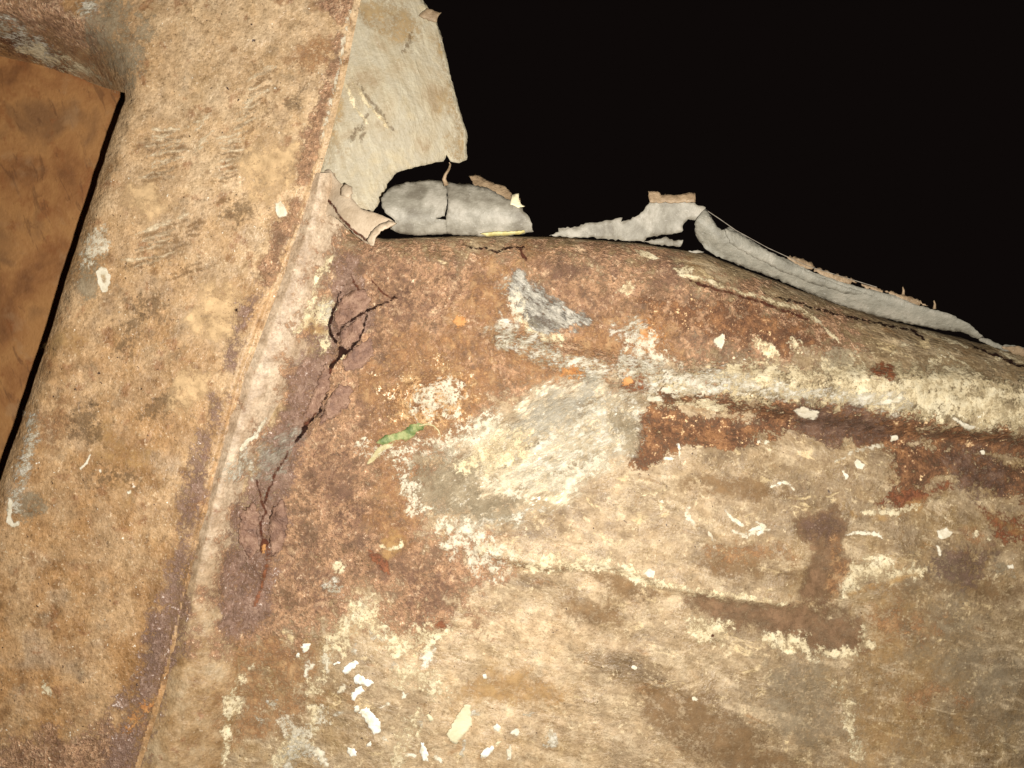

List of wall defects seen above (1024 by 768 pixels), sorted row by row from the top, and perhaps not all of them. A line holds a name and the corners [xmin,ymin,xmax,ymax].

peeling [320,0,534,246]
peeling [552,191,1024,356]
peeling [752,336,803,360]
crack [253,279,398,607]
peeling [677,399,729,412]
peeling [793,407,819,420]
peeling [880,393,903,405]
corrosion [0,220,1024,768]
damp [684,591,869,656]